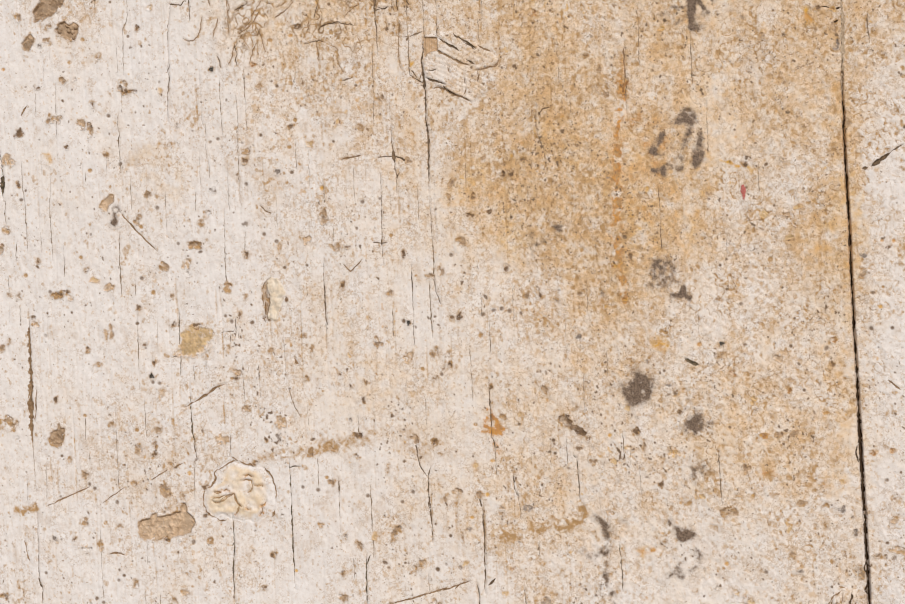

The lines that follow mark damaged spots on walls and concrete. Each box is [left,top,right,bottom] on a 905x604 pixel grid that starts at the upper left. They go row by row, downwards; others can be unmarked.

spalling [21,0,79,51]
crack [0,155,65,276]
crack [366,0,441,343]
damp [379,0,905,604]
crack [822,0,870,604]
crack [19,306,47,500]
spalling [48,423,65,448]
corrosion [476,404,512,464]
spalling [137,483,208,543]